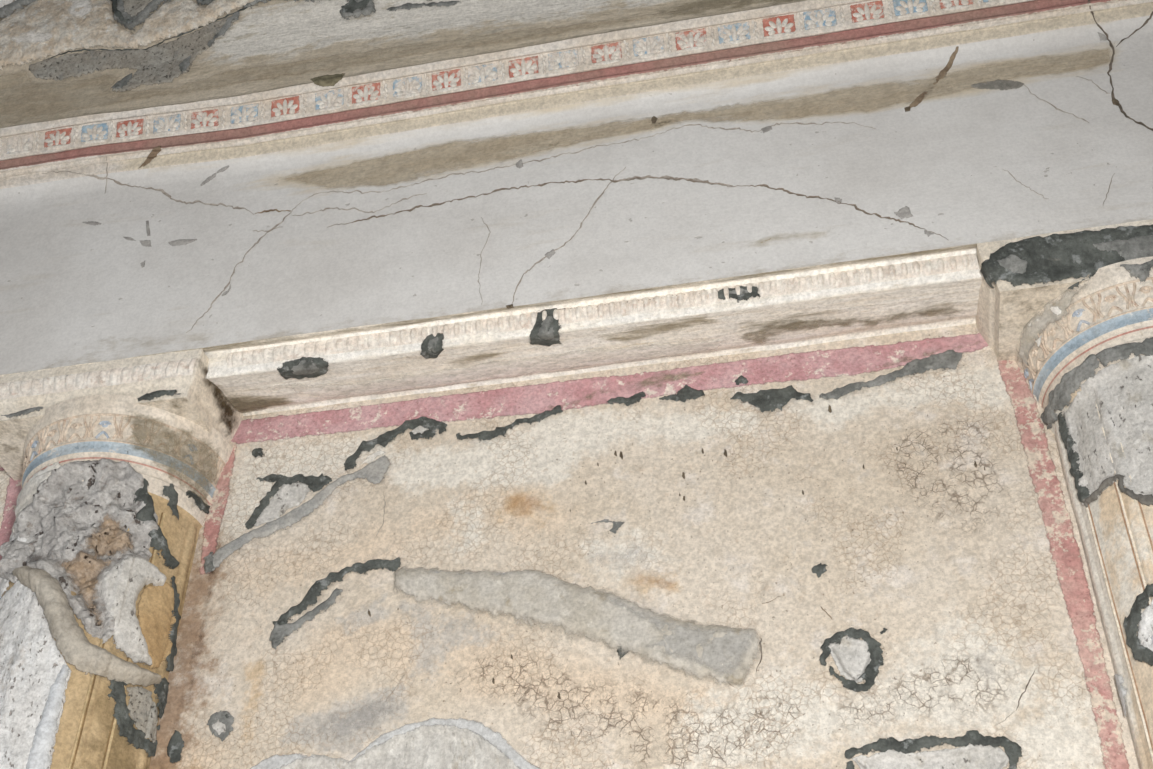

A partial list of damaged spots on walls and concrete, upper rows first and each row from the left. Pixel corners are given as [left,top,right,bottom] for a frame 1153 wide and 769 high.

flaking render [0,0,254,92]
crack [1023,84,1089,123]
crack [1076,0,1153,131]
crack [42,152,948,333]
flaking render [1040,337,1153,508]
peeling [254,482,312,526]
spalling [0,458,159,769]
flaking render [107,582,176,757]
crack [482,665,794,764]
flaking render [819,627,887,692]
flaking render [844,730,1022,769]
flaking render [1123,584,1153,666]